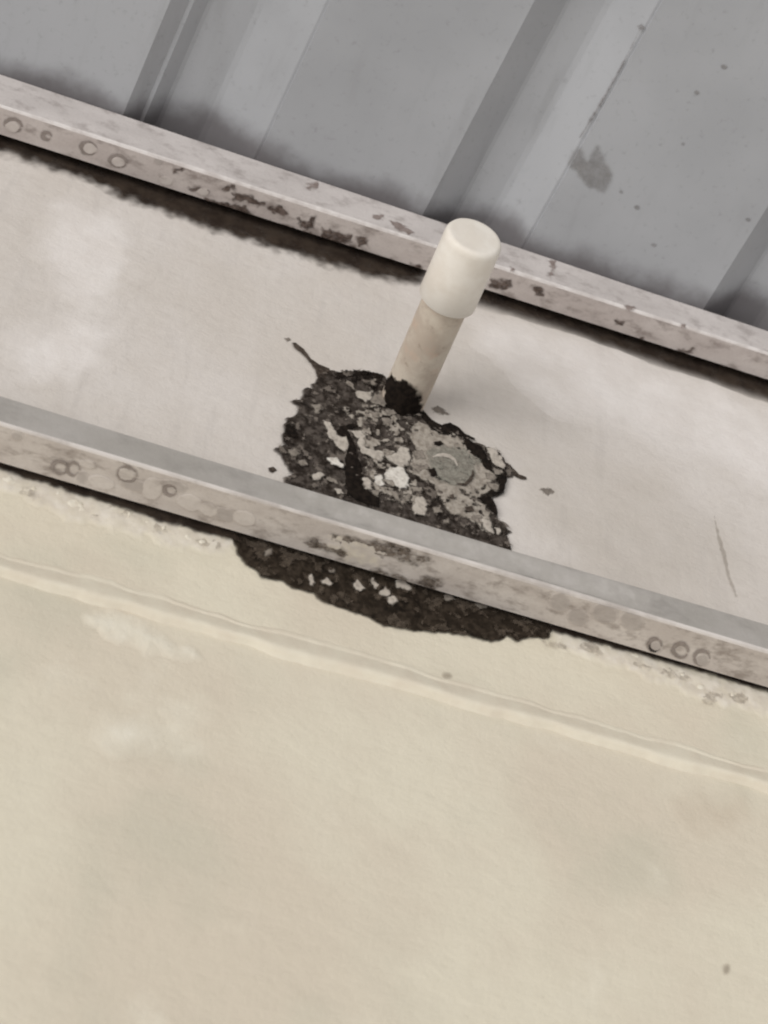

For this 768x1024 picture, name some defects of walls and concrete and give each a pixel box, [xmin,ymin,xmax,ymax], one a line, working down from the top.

leakage [0,118,425,393]
spalling [268,338,527,551]